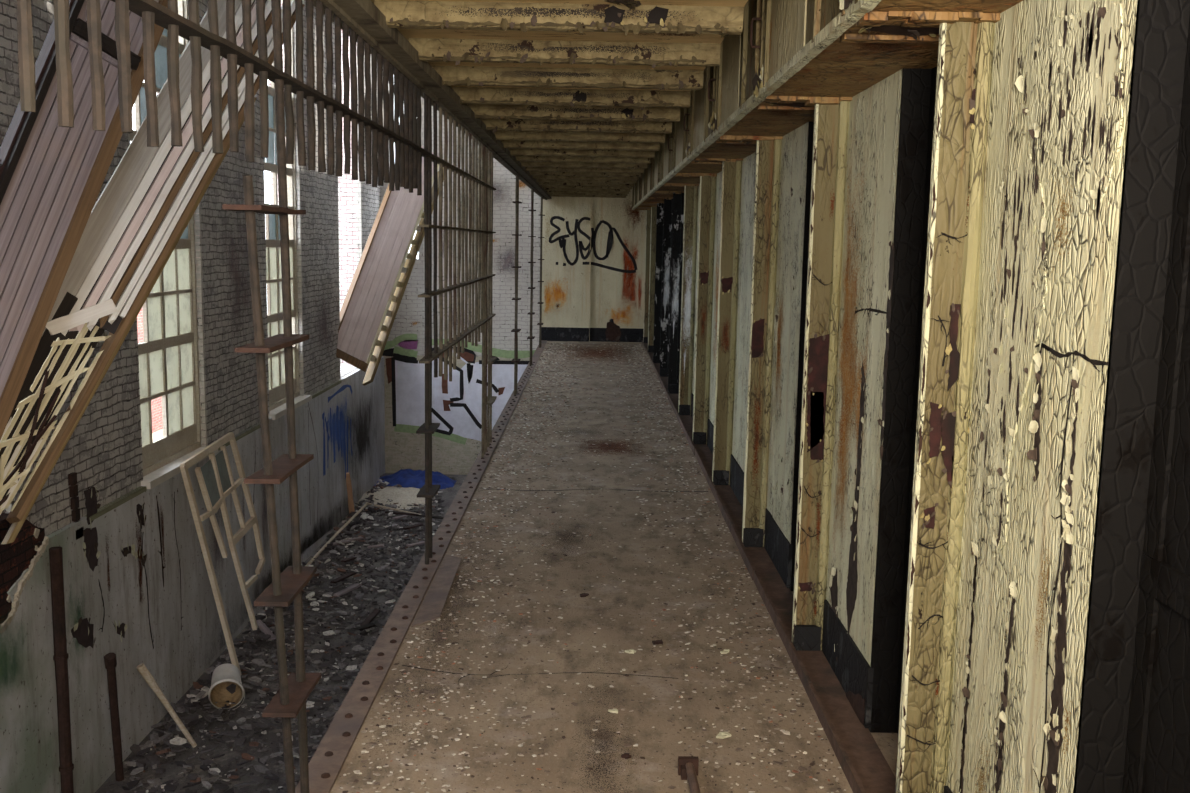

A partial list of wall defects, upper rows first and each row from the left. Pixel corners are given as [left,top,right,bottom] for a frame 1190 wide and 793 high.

peeling [387,0,729,38]
flaking render [0,519,49,634]
rust [604,231,642,325]
peeling [751,318,767,358]
peeling [772,318,829,546]
peeling [788,186,814,290]
peeling [793,560,815,635]
rust [814,128,869,570]
peeling [829,362,866,634]
peeling [878,239,894,460]
peeling [915,1,1124,793]
crack [1033,339,1109,793]